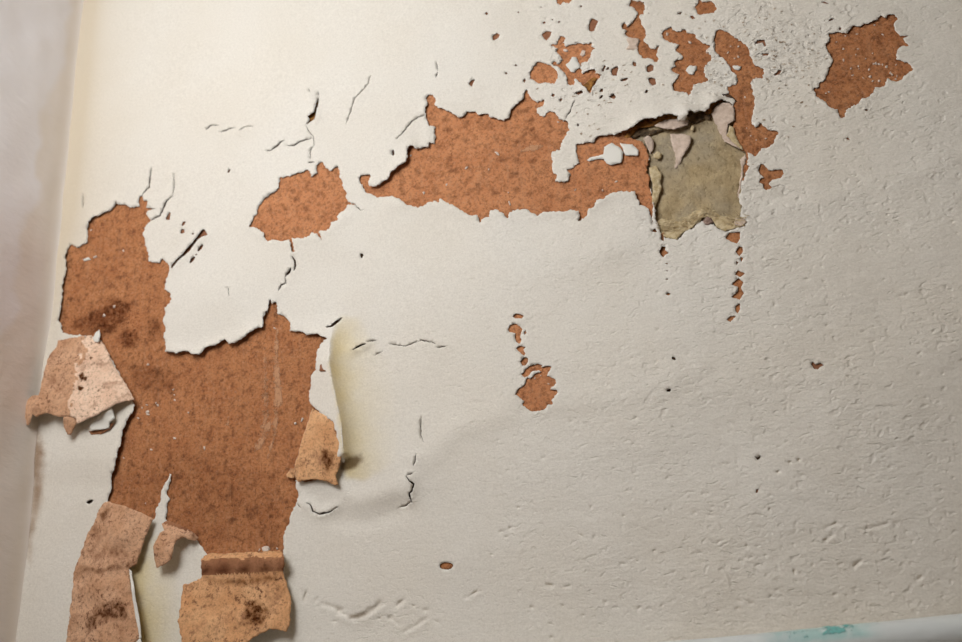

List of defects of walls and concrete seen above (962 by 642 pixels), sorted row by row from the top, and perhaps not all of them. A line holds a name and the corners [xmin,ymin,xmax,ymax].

crack [266,93,319,163]
peeling [359,0,913,280]
peeling [249,162,364,252]
peeling [25,168,341,642]
crack [353,340,446,355]
peeling [508,314,558,412]
crack [402,426,423,507]